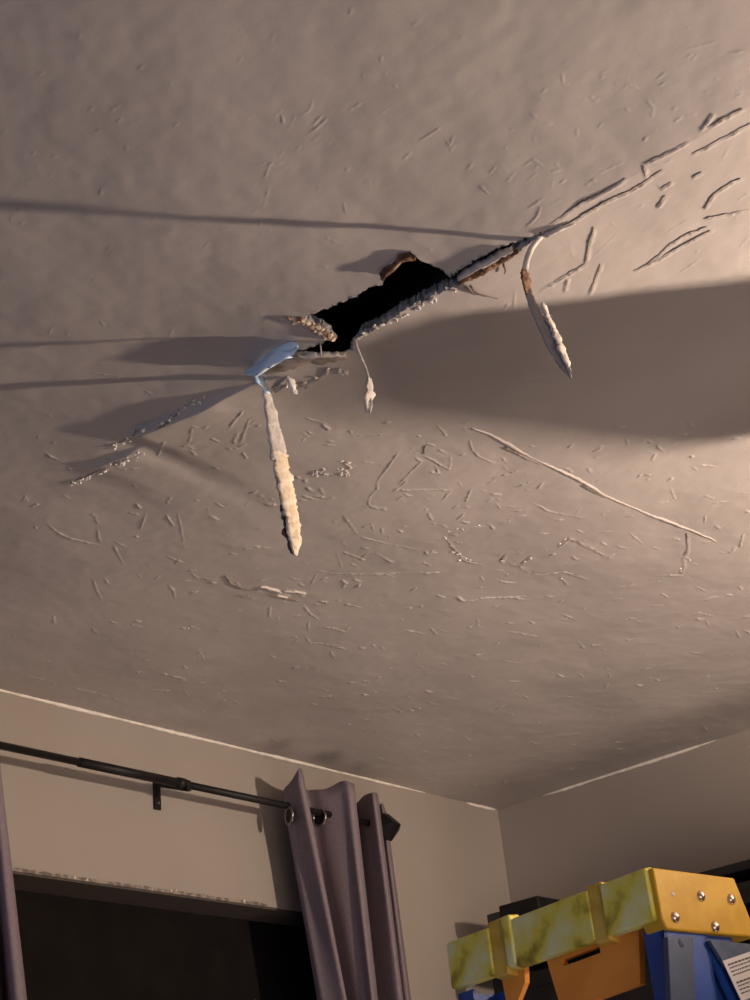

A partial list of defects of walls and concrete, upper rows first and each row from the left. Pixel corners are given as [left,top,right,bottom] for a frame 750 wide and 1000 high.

crack [544,108,750,294]
spalling [287,242,514,353]